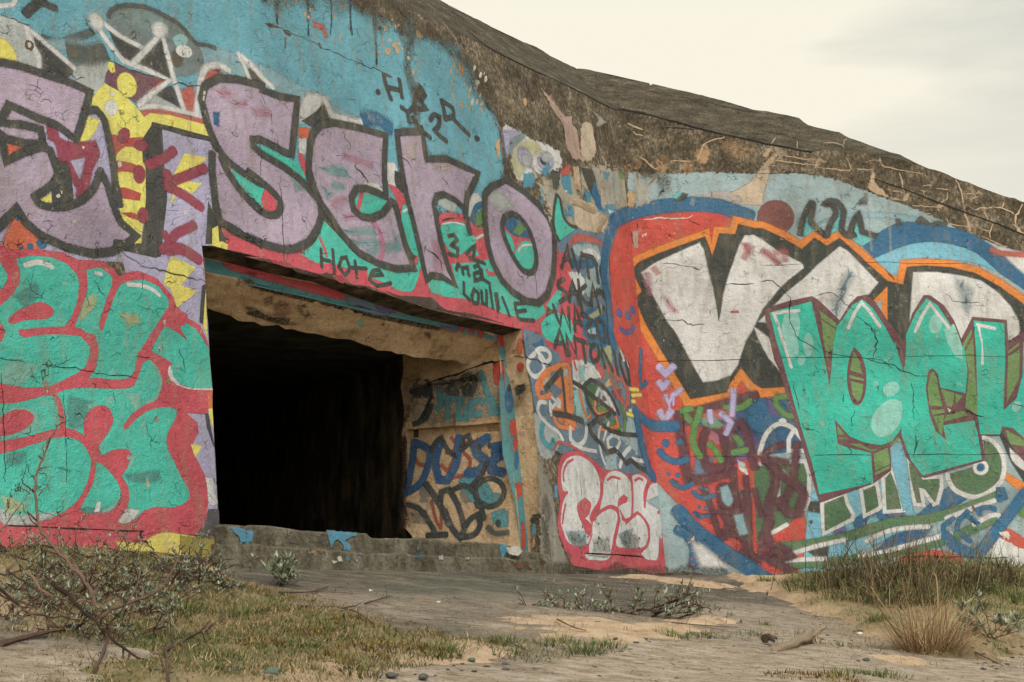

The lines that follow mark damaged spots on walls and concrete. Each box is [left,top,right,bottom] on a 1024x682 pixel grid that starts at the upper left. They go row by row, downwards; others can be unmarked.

peeling [541,88,699,249]
peeling [682,145,714,175]
crack [434,3,1024,247]
spalling [248,257,369,288]
spalling [384,290,504,324]
crack [726,262,1009,467]